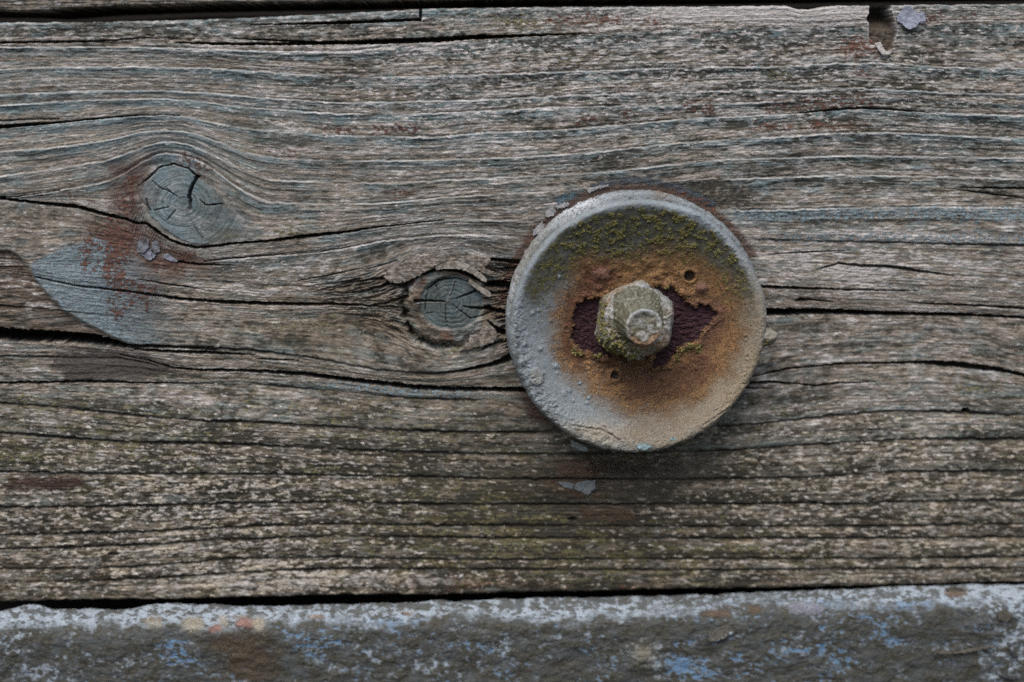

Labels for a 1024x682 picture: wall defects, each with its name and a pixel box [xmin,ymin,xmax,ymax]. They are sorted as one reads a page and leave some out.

peeling [137,237,177,262]
crack [0,162,528,394]
rust [500,182,756,302]
crack [760,249,1024,320]
rust [551,251,741,414]
rust [525,396,550,423]
crack [702,359,1024,427]